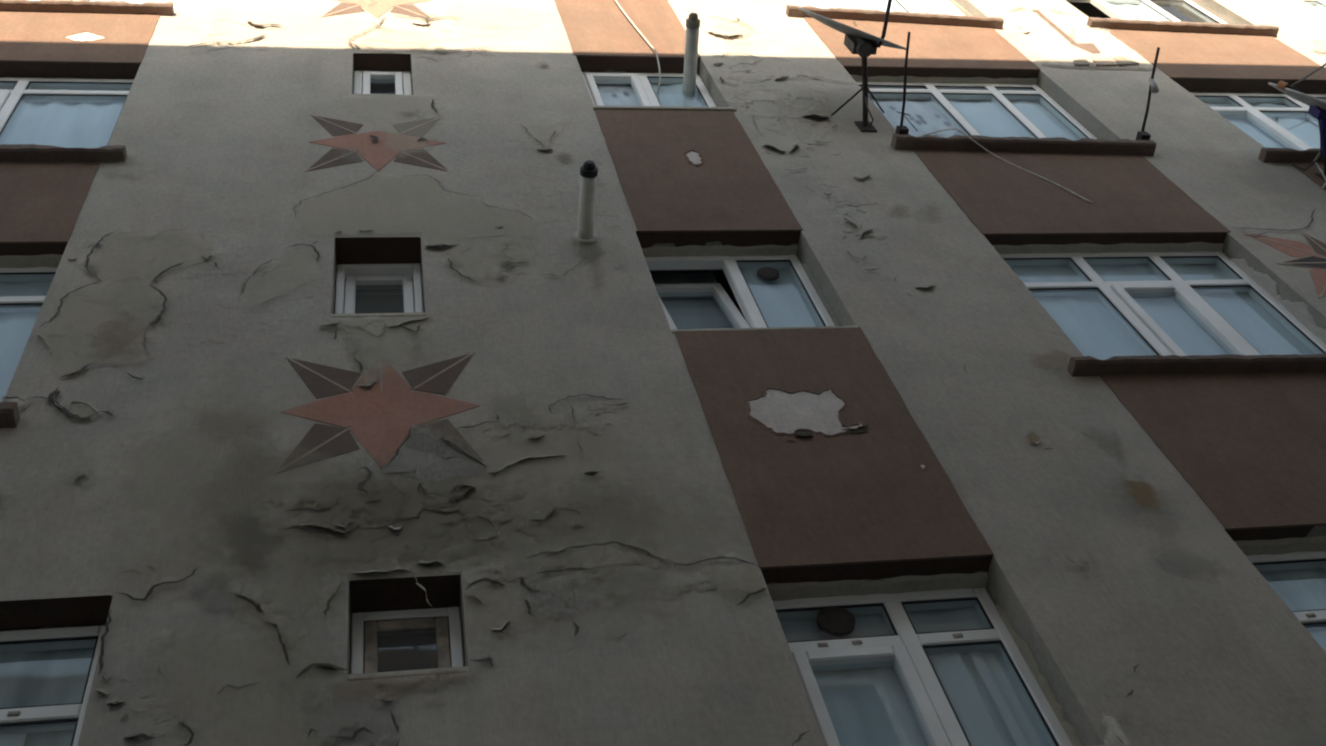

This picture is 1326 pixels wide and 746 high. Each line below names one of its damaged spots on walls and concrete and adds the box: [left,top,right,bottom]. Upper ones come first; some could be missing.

flaking render [703,14,840,159]
flaking render [406,125,630,288]
flaking render [816,174,889,268]
spalling [2,363,113,423]
flaking render [745,387,870,442]
flaking render [279,521,360,538]
flaking render [225,576,347,678]
flaking render [323,560,445,617]